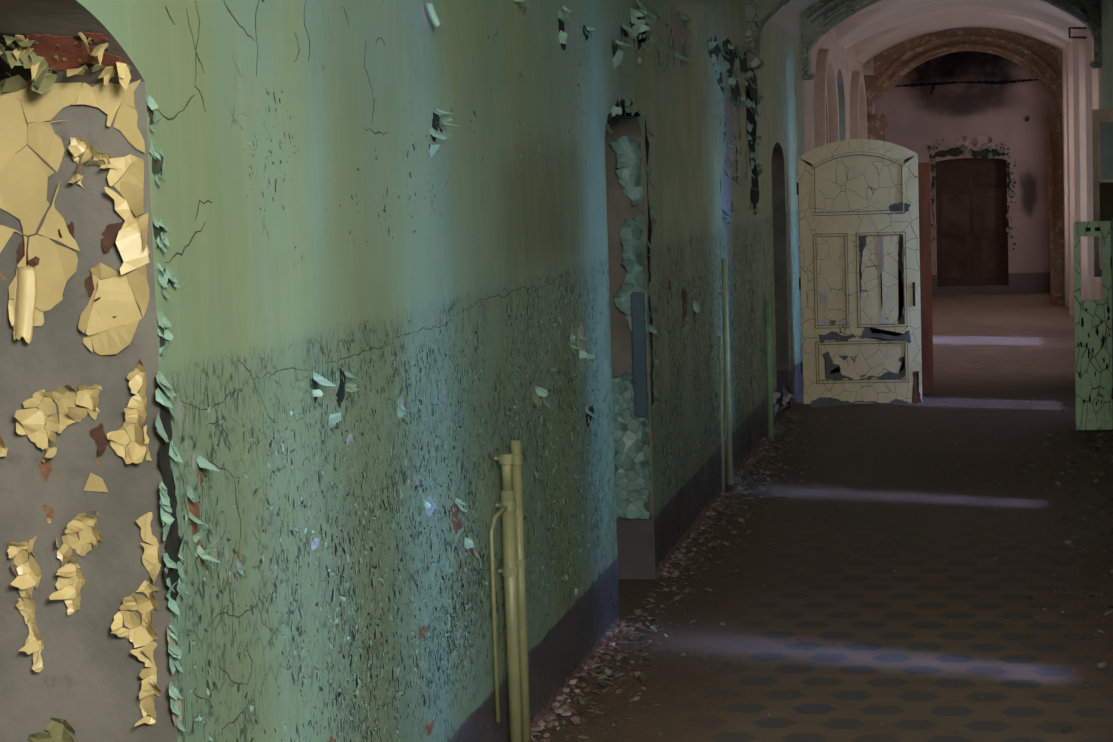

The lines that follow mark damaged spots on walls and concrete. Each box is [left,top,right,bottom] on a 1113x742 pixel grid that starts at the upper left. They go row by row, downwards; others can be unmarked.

crack [155,1,206,121]
crack [223,0,259,77]
crack [294,1,310,62]
crack [343,7,389,135]
peeling [421,1,441,28]
peeling [612,0,764,227]
water stain [910,51,1013,115]
crack [165,200,212,263]
peeling [926,135,1017,253]
water stain [1021,174,1036,214]
peeling [504,96,703,602]
peeling [818,235,911,380]